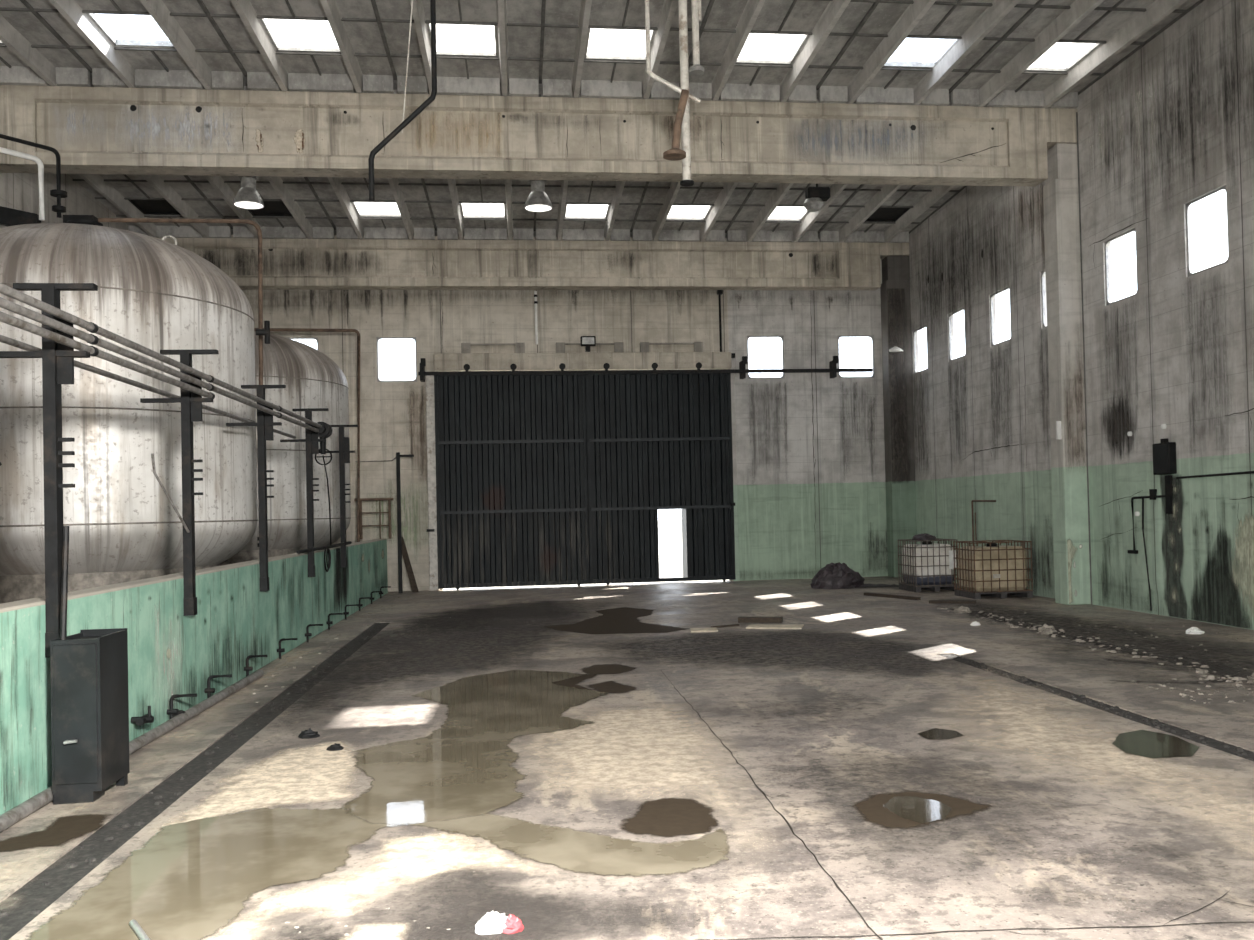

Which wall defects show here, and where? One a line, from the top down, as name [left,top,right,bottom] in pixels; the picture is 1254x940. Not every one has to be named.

leakage [1191,529,1250,629]
crack [663,673,1254,940]